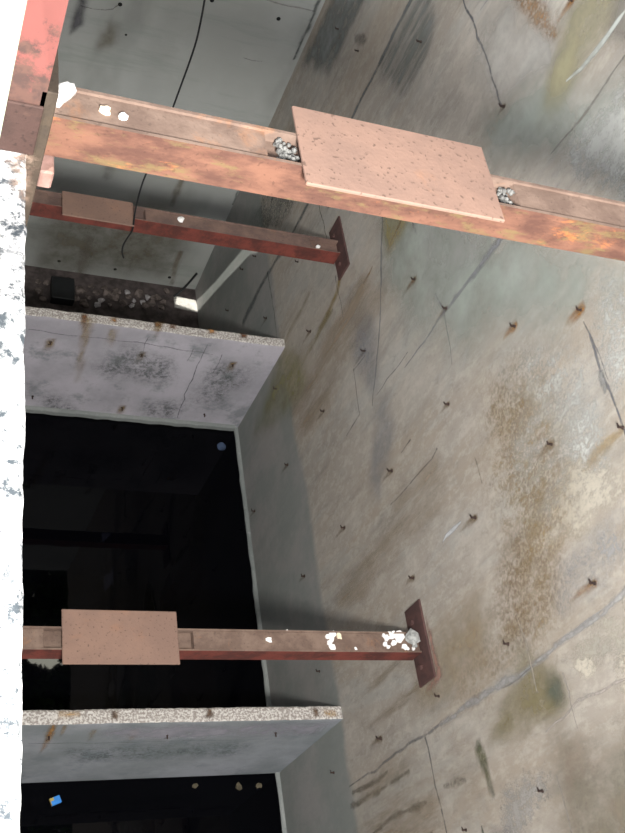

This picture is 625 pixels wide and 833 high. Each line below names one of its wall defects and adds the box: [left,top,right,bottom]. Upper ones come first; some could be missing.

water stain [72,0,85,29]
crack [463,0,502,105]
water stain [480,0,570,95]
crack [583,322,625,433]